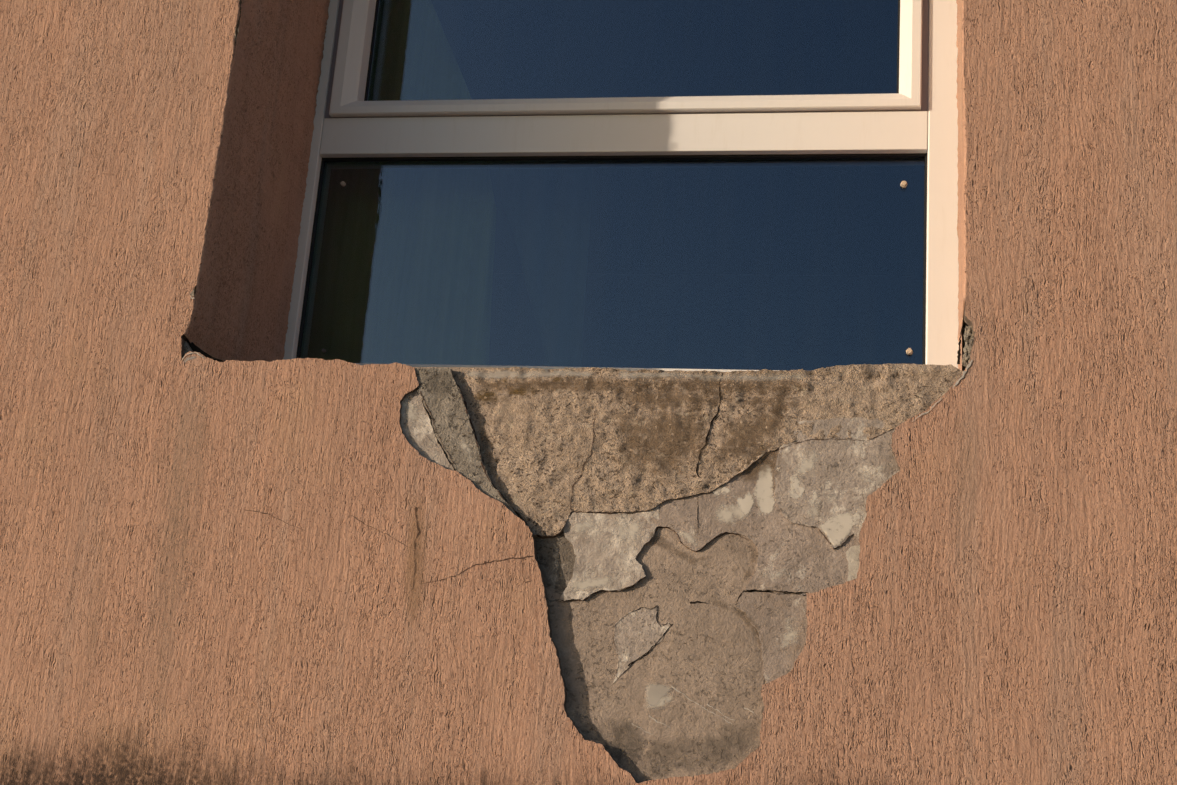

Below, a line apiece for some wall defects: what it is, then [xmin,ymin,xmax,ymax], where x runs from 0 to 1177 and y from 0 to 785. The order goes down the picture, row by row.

crack [231,0,242,62]
crack [696,373,723,532]
crack [419,556,532,584]
flaking render [400,325,974,783]
damp [0,739,236,785]